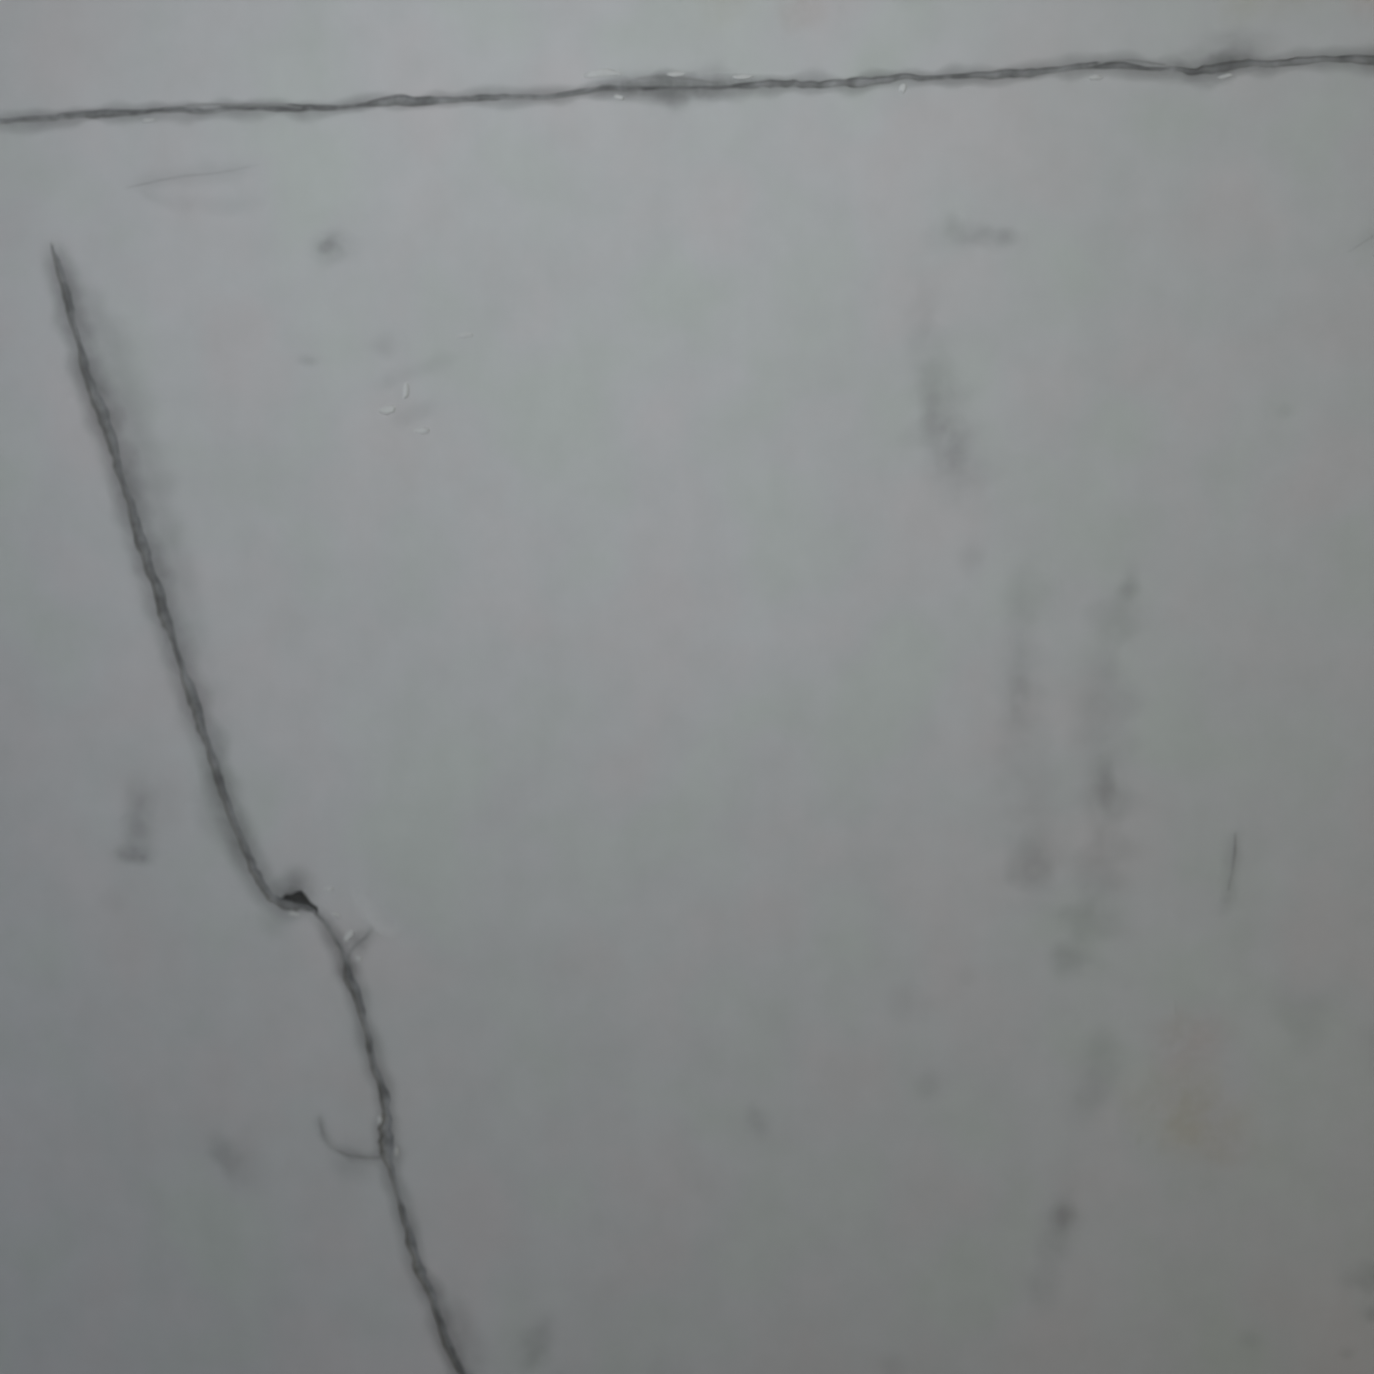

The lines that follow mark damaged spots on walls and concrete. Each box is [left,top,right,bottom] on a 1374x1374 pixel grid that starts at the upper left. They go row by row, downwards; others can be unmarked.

crack [0,55,1374,124]
crack [51,244,466,1374]